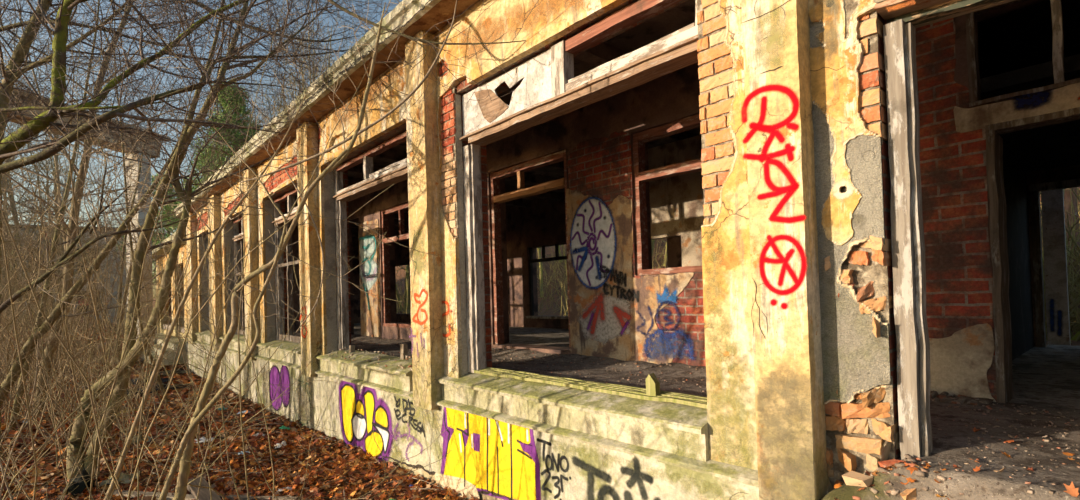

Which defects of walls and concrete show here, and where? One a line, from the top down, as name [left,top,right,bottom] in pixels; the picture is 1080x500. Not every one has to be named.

flaking render [436,60,468,243]
flaking render [697,0,738,227]
peeling [809,17,826,49]
peeling [812,0,900,494]
leakage [758,376,814,500]